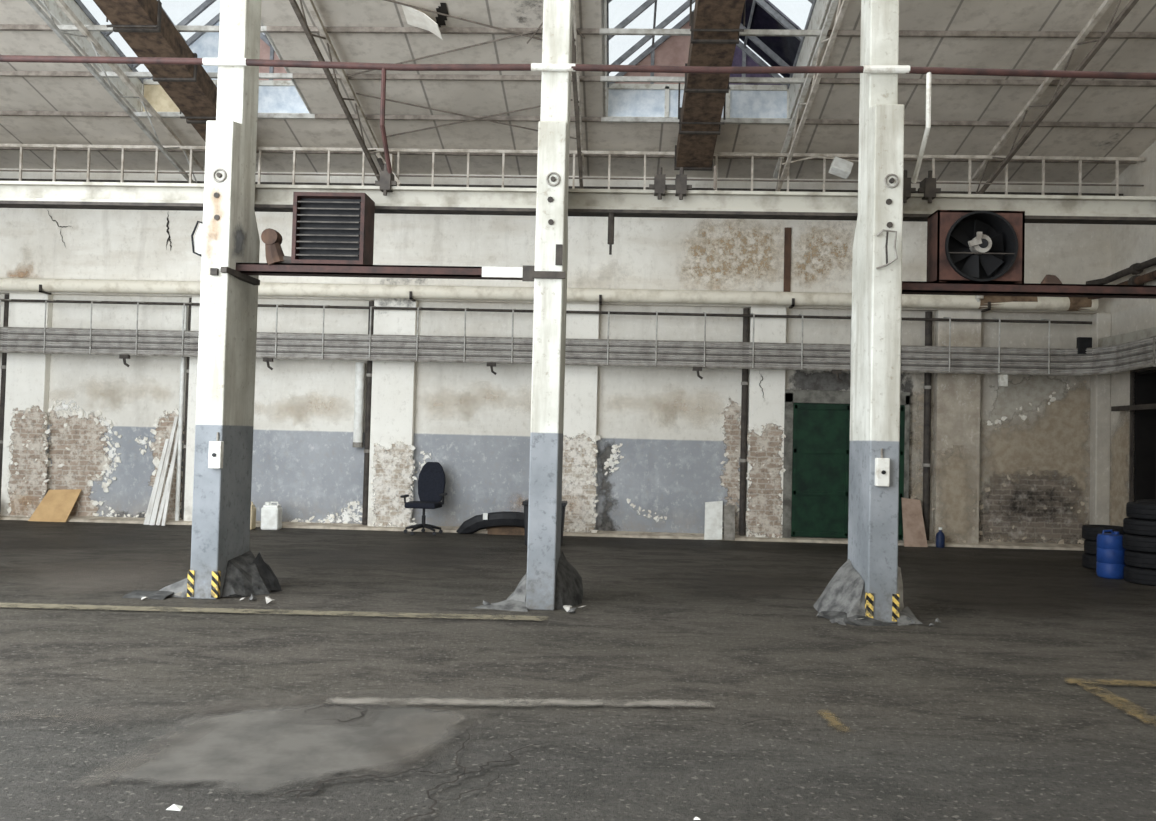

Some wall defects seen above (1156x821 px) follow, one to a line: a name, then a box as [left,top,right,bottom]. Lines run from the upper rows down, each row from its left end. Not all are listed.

flaking render [686,221,783,289]
flaking render [794,237,848,282]
flaking render [5,400,184,519]
flaking render [289,441,431,527]
flaking render [562,430,624,533]
flaking render [719,398,786,538]
flaking render [979,470,1085,544]
crack [263,728,573,821]